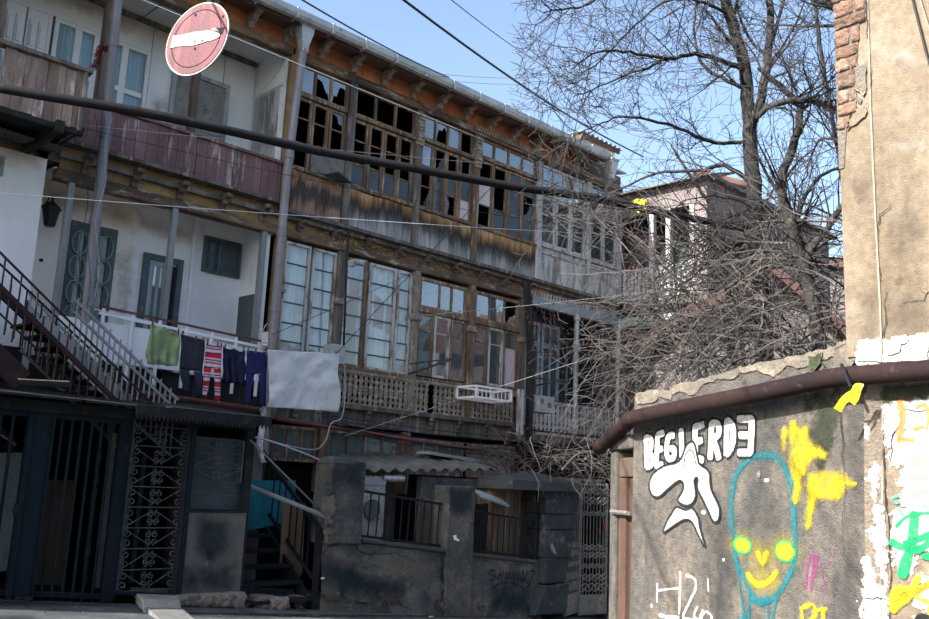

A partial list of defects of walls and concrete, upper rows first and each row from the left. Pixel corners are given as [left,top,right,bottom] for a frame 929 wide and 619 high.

peeling [807,333,929,372]
crack [858,268,929,364]
leakage [199,521,224,559]
peeling [856,396,929,619]
crack [861,388,925,619]